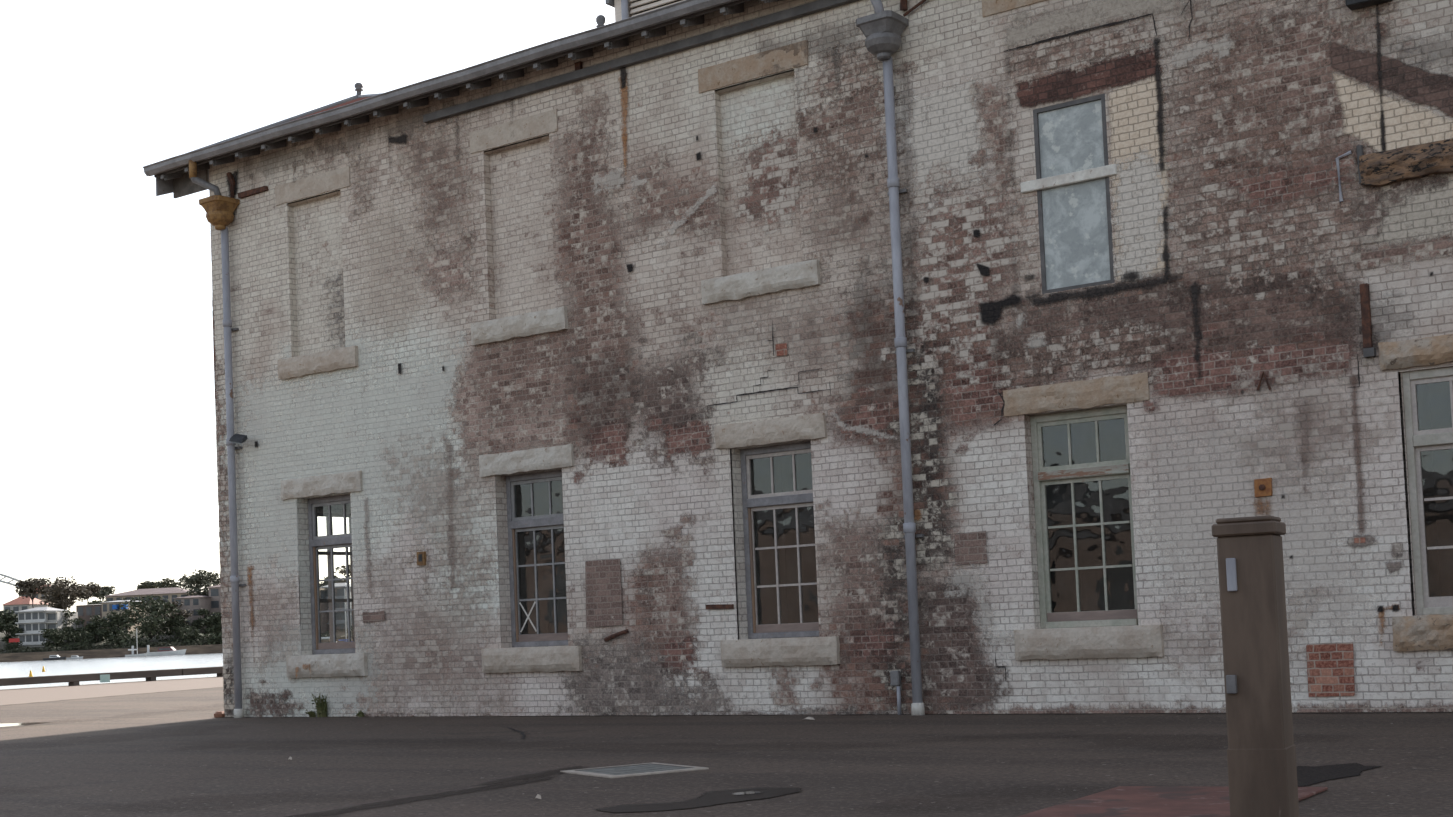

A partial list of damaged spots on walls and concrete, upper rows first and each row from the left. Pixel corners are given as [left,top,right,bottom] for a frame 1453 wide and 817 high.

crack [1004,0,1193,52]
rust [618,67,628,174]
peeling [408,241,479,306]
peeling [447,0,1453,714]